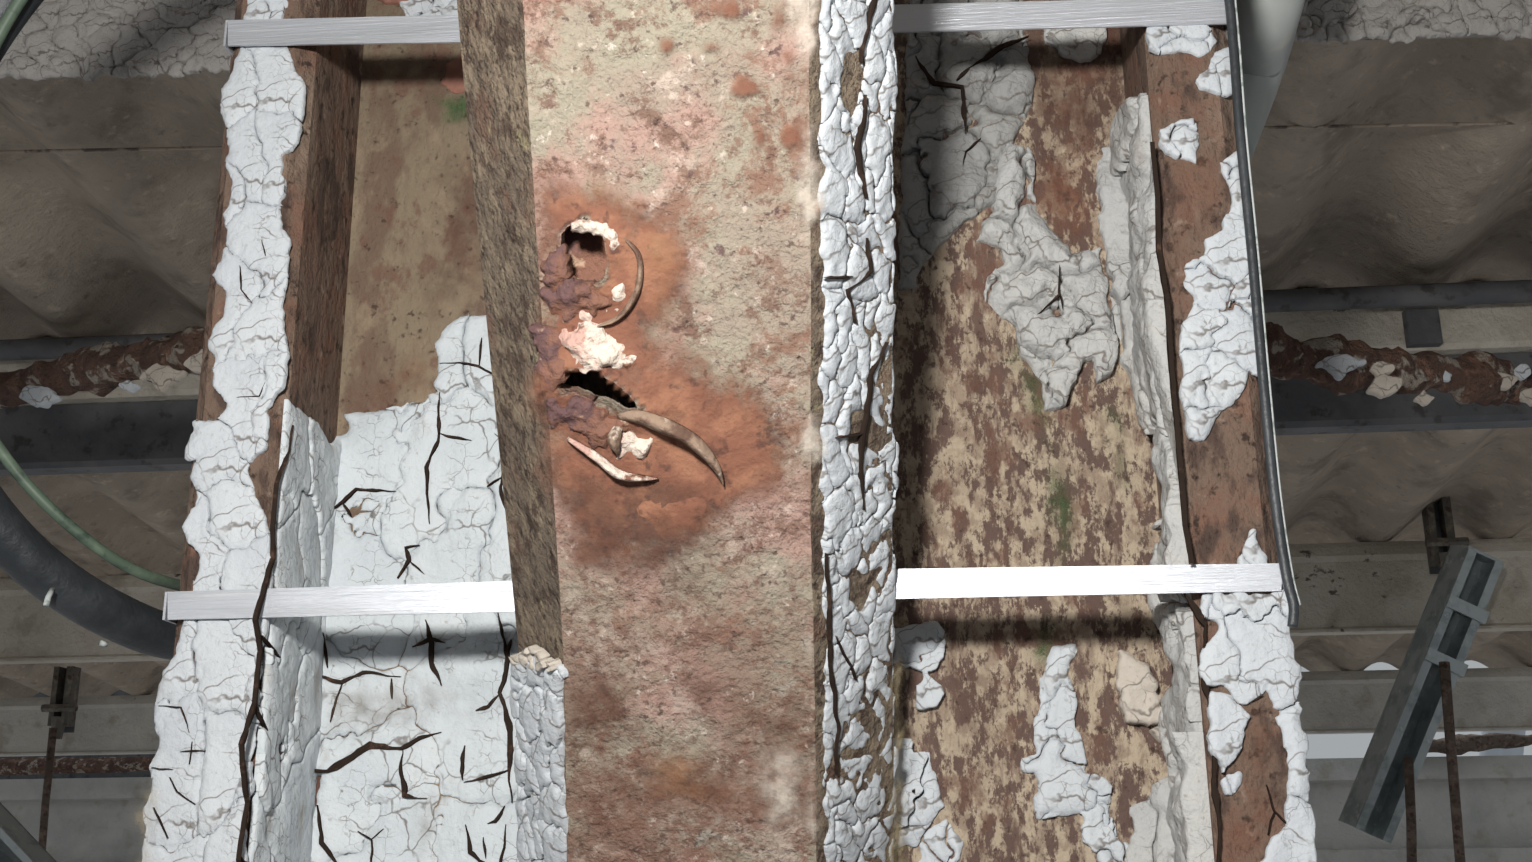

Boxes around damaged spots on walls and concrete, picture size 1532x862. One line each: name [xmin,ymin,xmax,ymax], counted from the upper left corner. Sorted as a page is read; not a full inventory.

crack [853,0,877,199]
corrosion [0,326,205,409]
peeling [0,0,512,591]
crack [334,337,497,579]
corrosion [528,185,780,559]
peeling [817,0,1257,862]
corrosion [1266,322,1532,407]
corrosion [0,757,154,775]
crack [152,425,294,862]
peeling [142,612,569,862]
crack [314,612,514,862]
peeling [1020,590,1317,862]